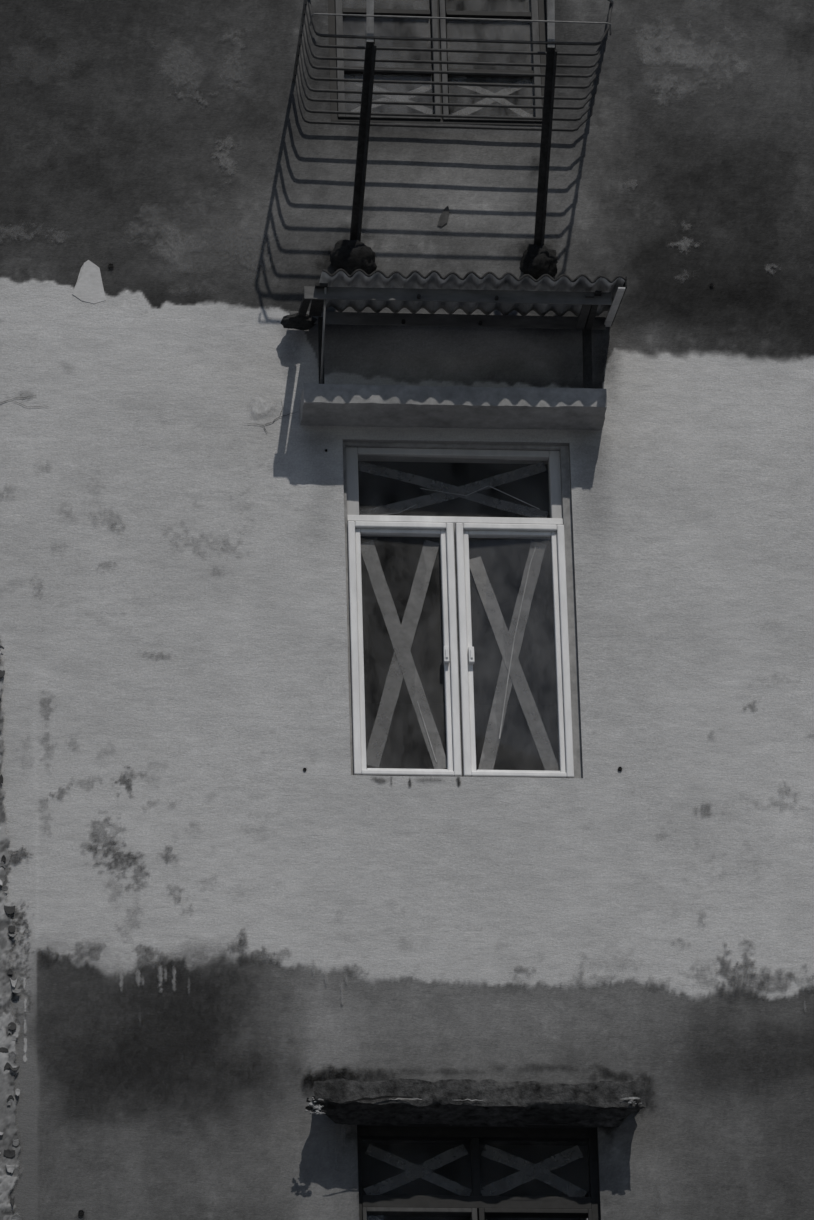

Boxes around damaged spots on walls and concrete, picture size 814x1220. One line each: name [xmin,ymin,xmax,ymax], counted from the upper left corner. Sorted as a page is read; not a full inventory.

peeling [0,645,32,1220]